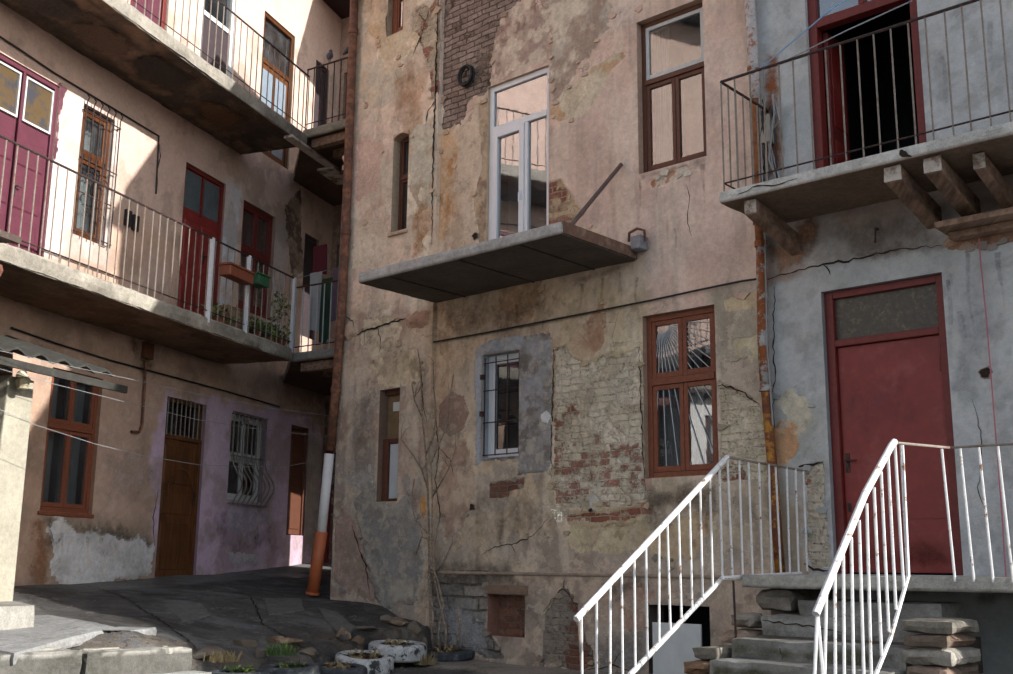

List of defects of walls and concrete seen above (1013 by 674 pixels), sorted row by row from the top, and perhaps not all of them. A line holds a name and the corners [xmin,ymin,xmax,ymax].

flaking render [355,0,626,243]
crack [346,317,429,351]
crack [718,245,942,428]
flaking render [546,298,718,571]
flaking render [771,388,816,438]
crack [483,521,545,554]
flaking render [536,589,594,671]